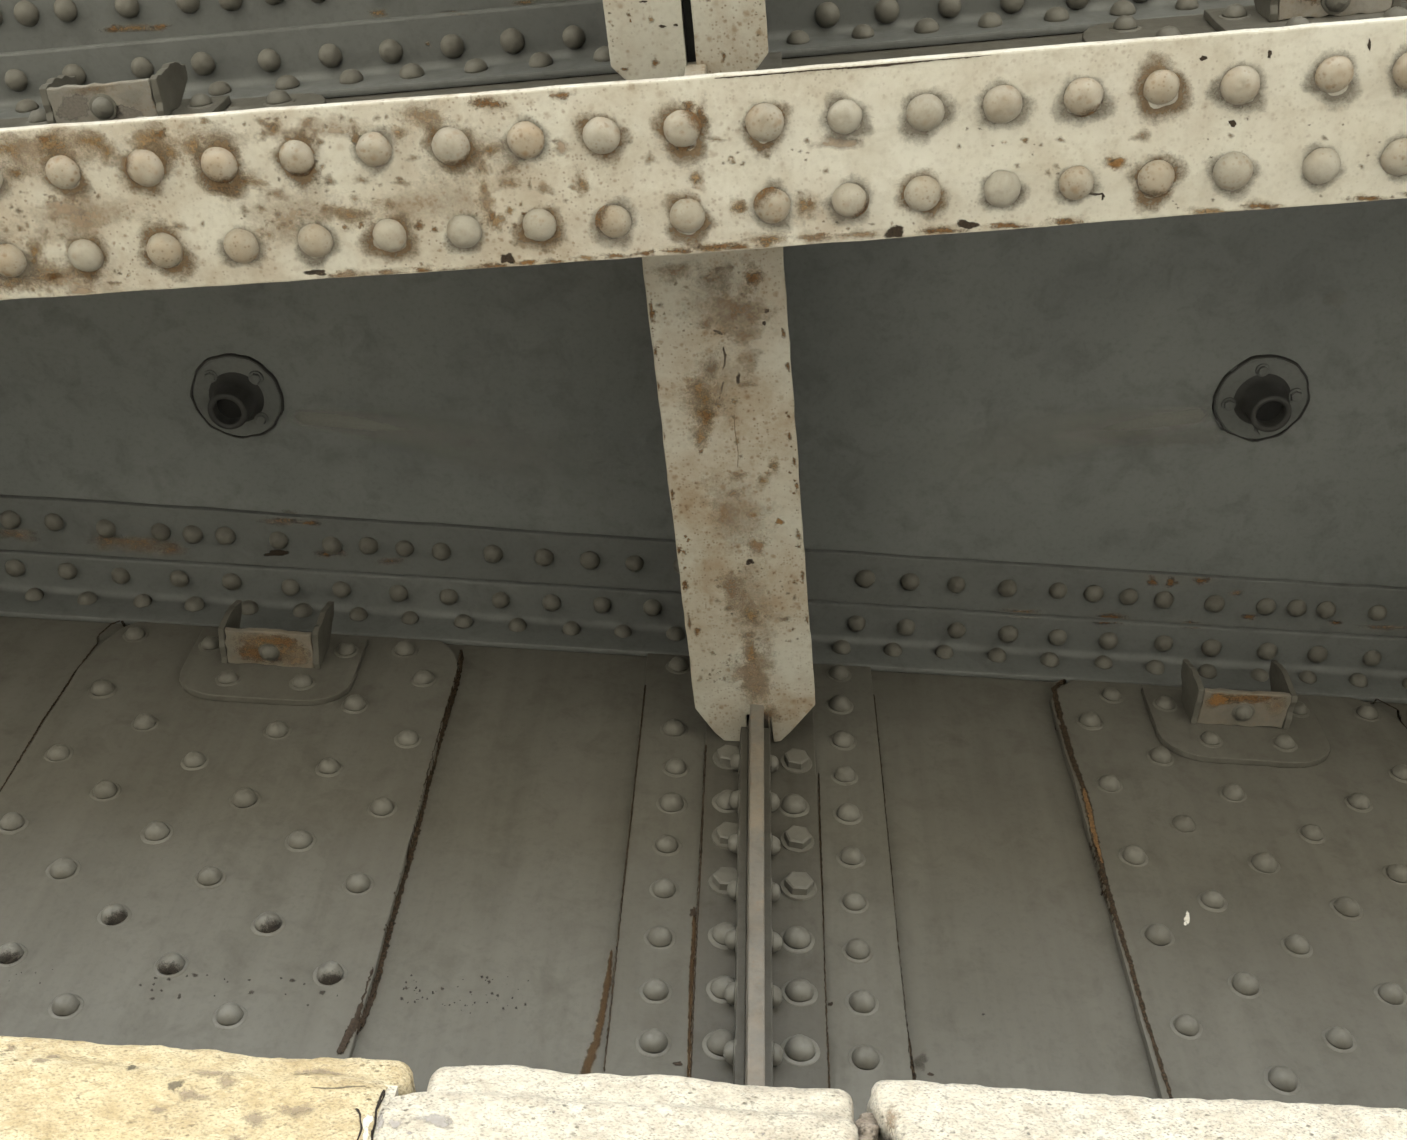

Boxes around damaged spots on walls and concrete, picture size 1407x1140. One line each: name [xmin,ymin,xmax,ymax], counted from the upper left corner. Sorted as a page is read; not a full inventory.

corrosion [56,87,101,121]
corrosion [0,105,455,294]
corrosion [474,98,506,107]
corrosion [409,110,587,268]
corrosion [722,105,857,165]
corrosion [798,173,1023,241]
corrosion [1107,157,1182,210]
corrosion [1136,55,1189,118]
corrosion [576,102,779,529]
corrosion [688,540,808,696]
corrosion [581,685,646,1074]
corrosion [1051,679,1174,1099]